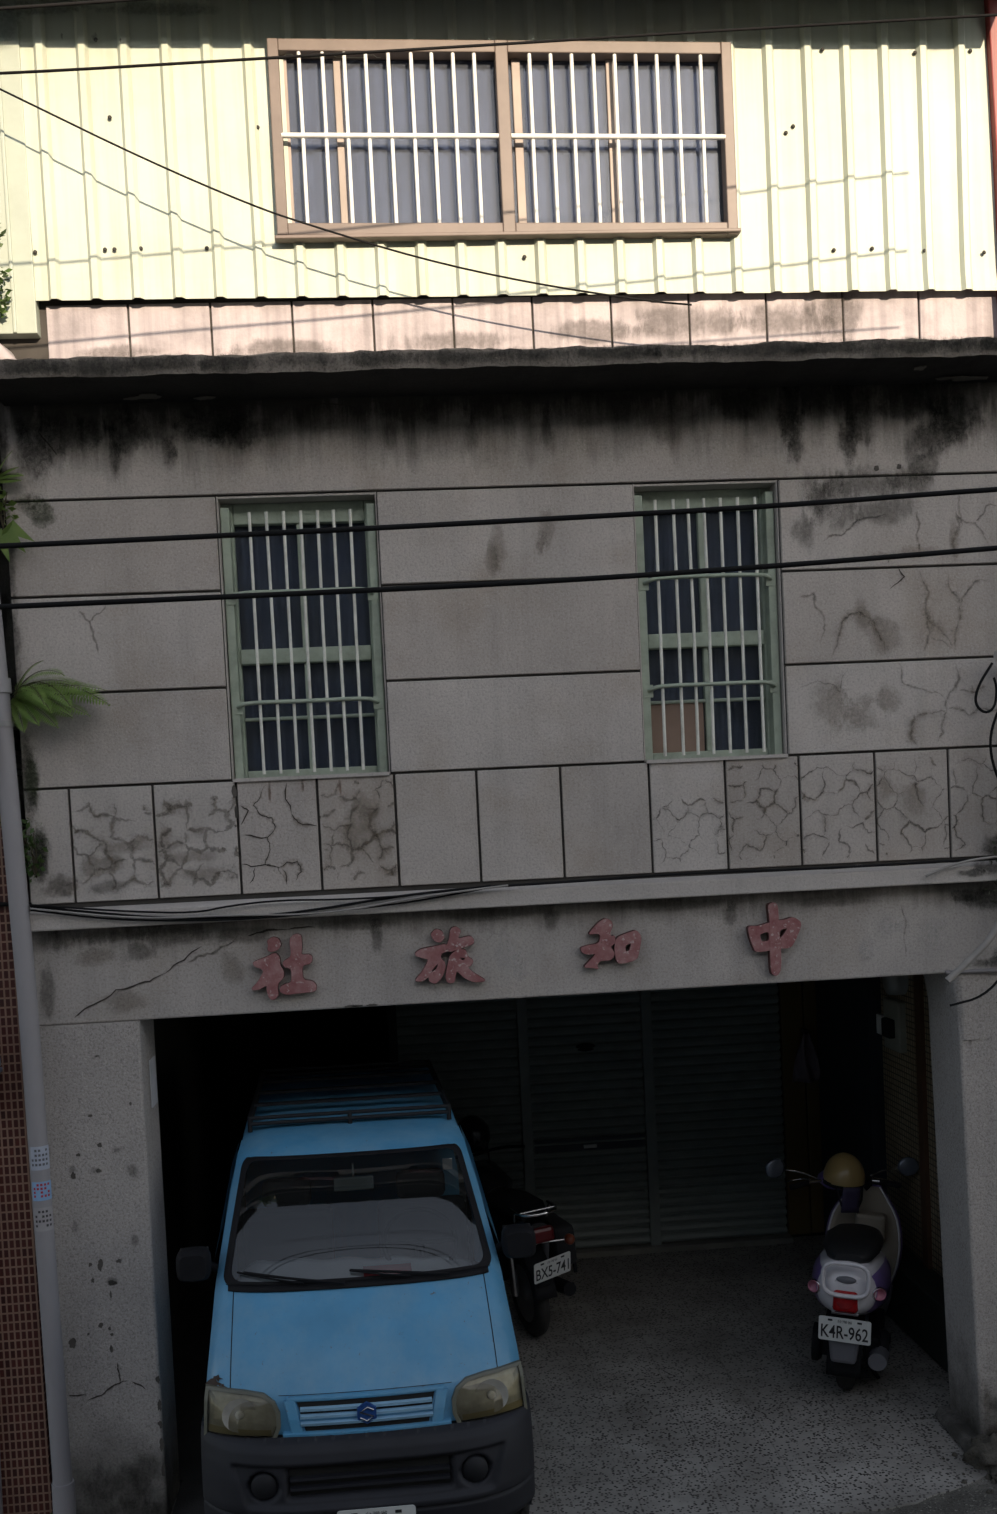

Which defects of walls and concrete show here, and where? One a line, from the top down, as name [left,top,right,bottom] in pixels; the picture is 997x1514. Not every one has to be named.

damp [779,383,980,456]
crack [241,783,316,884]
crack [75,926,312,1017]
crack [69,1363,145,1400]